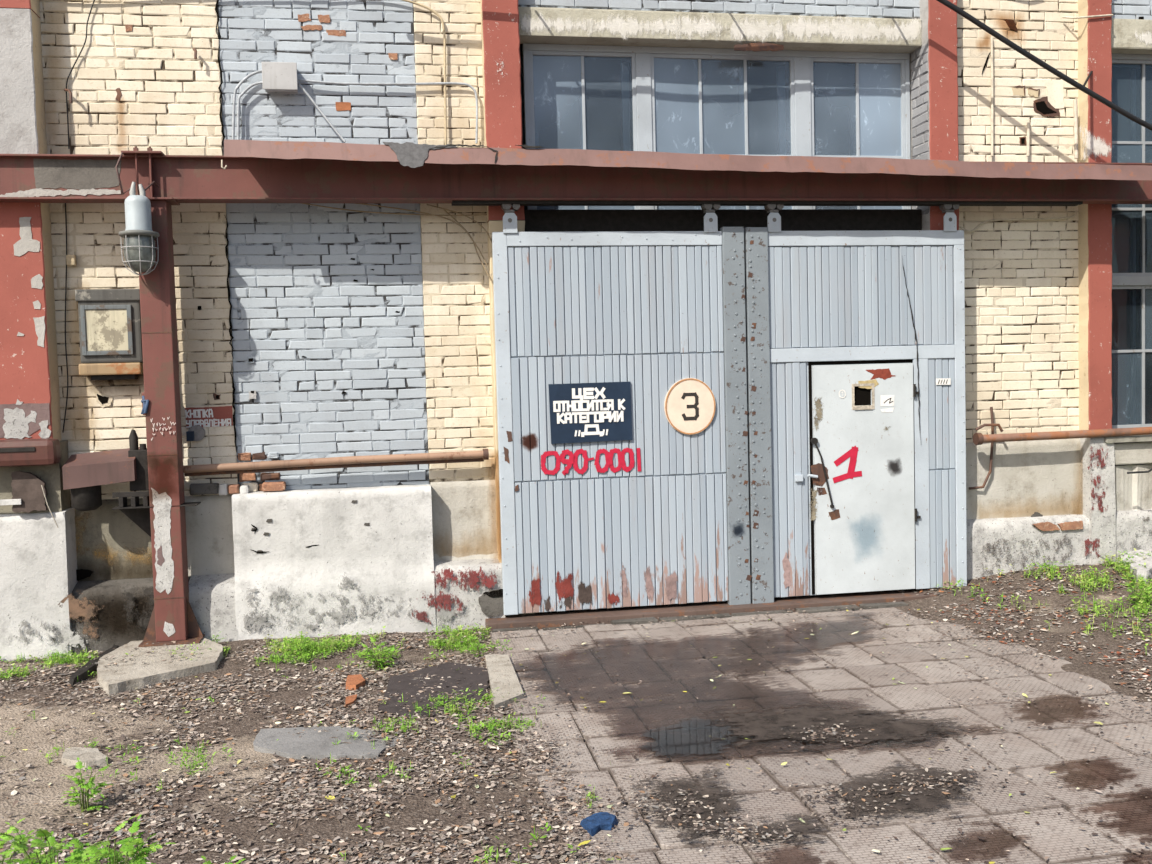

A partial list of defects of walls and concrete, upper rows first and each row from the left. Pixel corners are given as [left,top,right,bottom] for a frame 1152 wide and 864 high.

water stain [521,13,922,42]
peeling [1012,79,1064,117]
peeling [13,217,40,256]
peeling [17,274,45,347]
peeling [0,399,51,439]
peeling [151,488,174,594]
peeling [163,622,175,637]